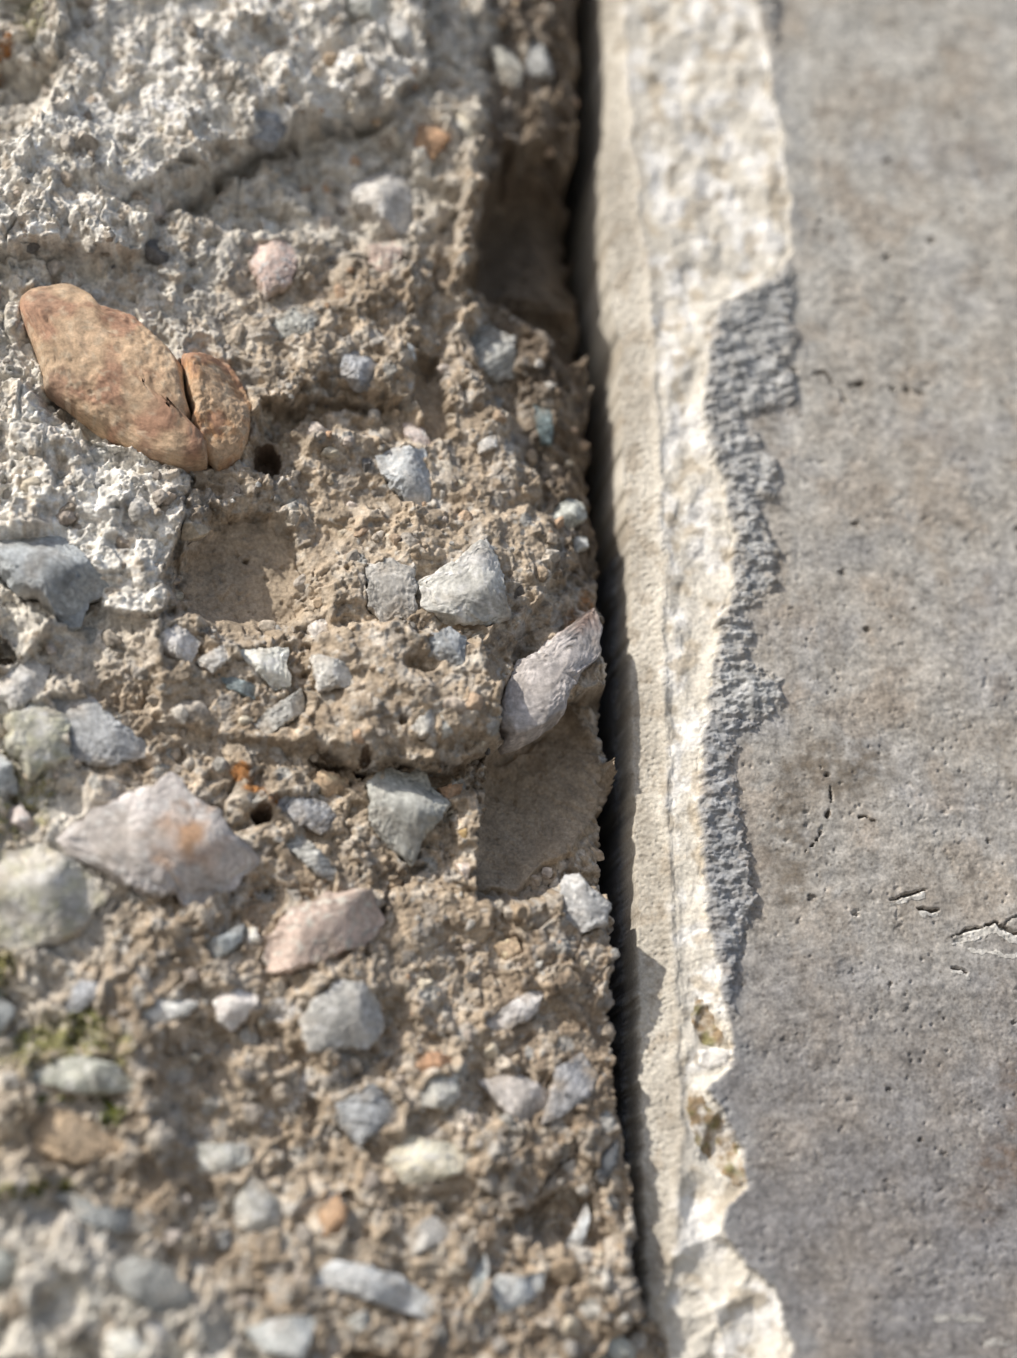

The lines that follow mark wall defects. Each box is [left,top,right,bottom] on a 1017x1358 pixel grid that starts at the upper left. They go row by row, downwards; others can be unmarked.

spalling [628,0,802,1358]
crack [889,890,1017,980]